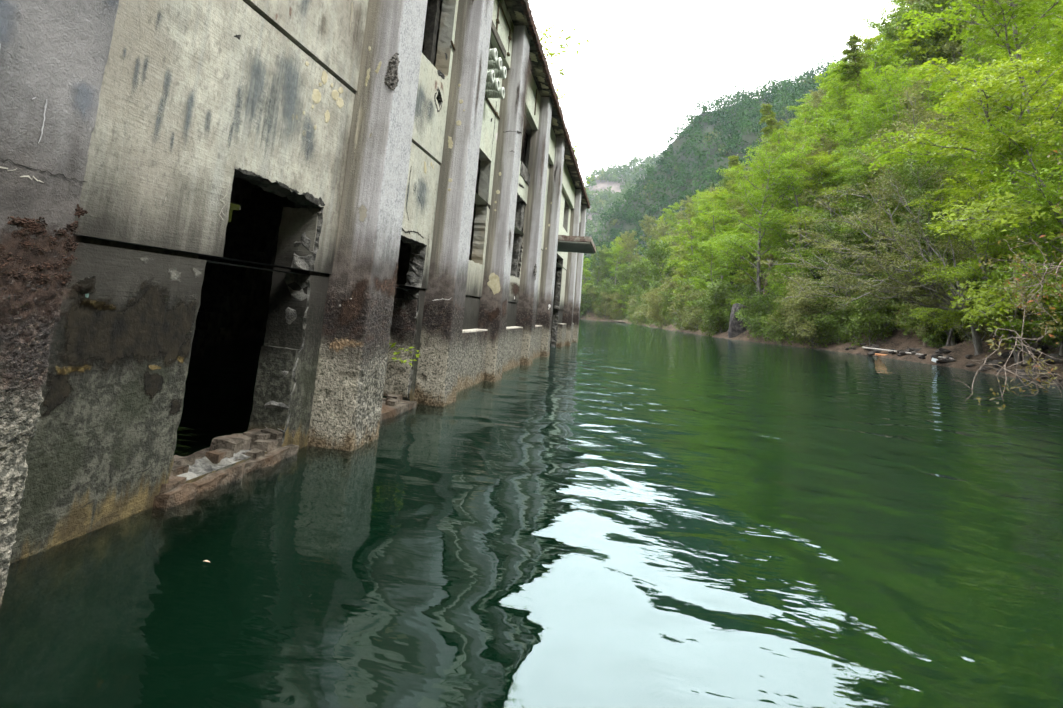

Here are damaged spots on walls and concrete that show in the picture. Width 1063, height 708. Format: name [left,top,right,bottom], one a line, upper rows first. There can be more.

spalling [365,52,400,91]
damp [157,76,170,130]
damp [229,61,298,141]
damp [305,119,313,160]